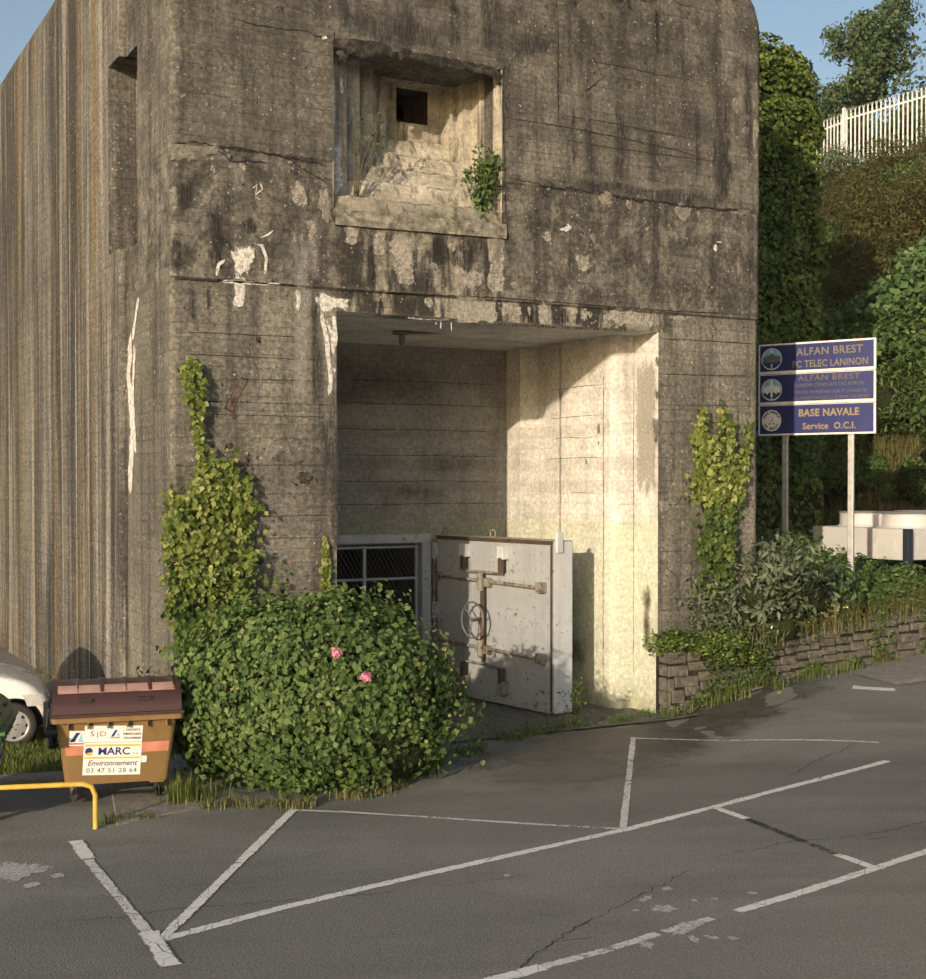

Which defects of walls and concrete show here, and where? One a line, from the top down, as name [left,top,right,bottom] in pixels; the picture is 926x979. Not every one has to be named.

damp [572,100,732,208]
damp [170,239,181,269]
damp [208,212,280,307]
damp [422,242,474,289]
damp [375,301,626,335]
damp [296,241,353,543]
corrosion [436,535,553,715]